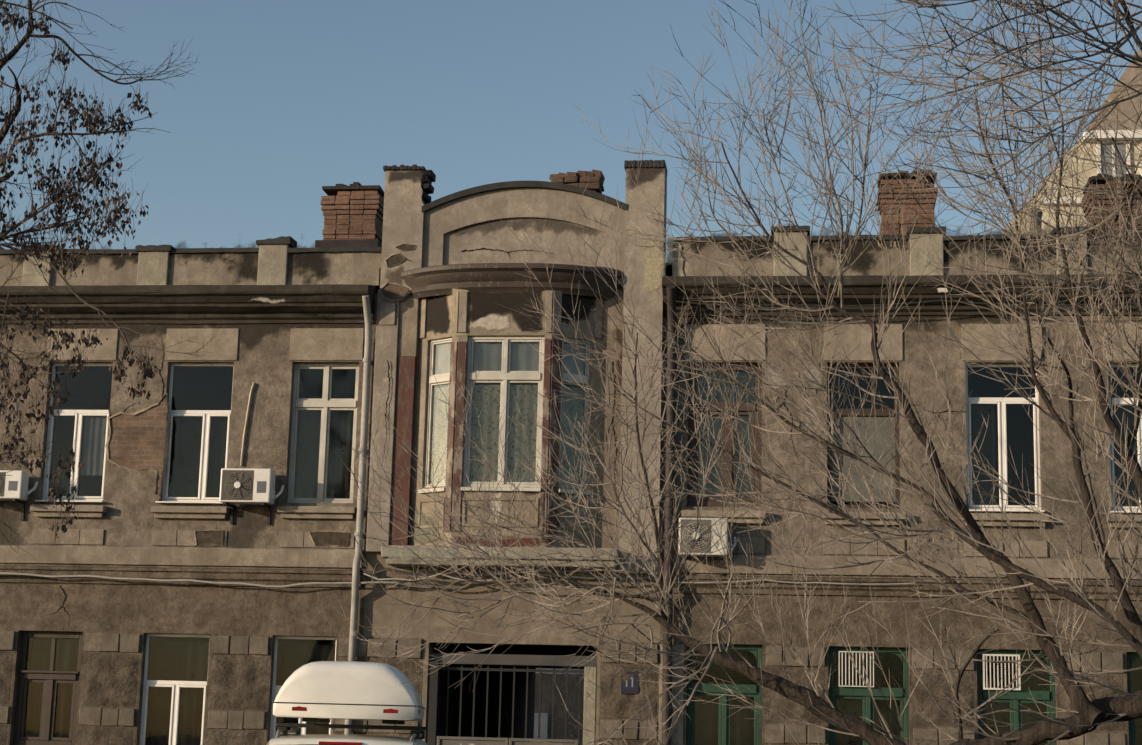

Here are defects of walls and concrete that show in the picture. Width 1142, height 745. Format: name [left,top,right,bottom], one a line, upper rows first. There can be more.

crack [461,248,547,258]
spalling [379,243,417,326]
peeling [450,288,509,336]
crack [52,585,70,627]